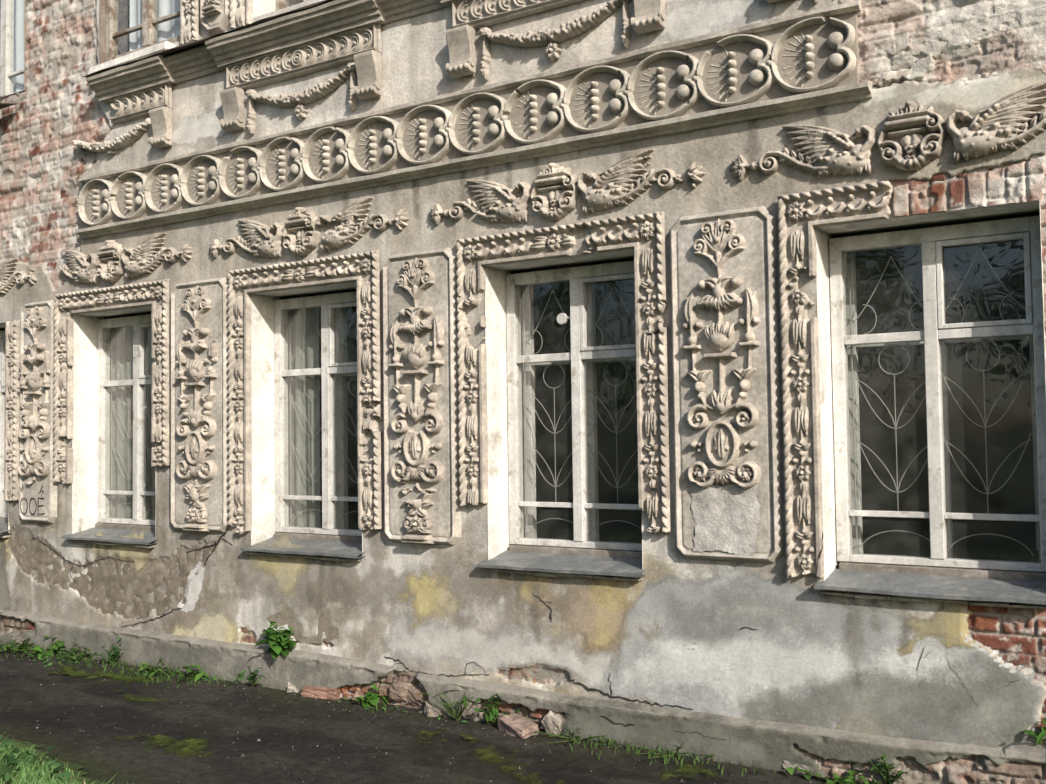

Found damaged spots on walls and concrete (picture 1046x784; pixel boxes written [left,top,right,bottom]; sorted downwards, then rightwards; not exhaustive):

spalling [833,0,1046,88]
spalling [0,0,112,290]
spalling [887,154,1046,367]
damp [0,538,17,619]
damp [6,482,61,538]
crack [33,537,135,583]
peeling [6,523,216,620]
crack [188,529,233,567]
damp [236,541,522,614]
crack [385,656,490,677]
spalling [967,605,1046,685]
crack [570,675,725,740]